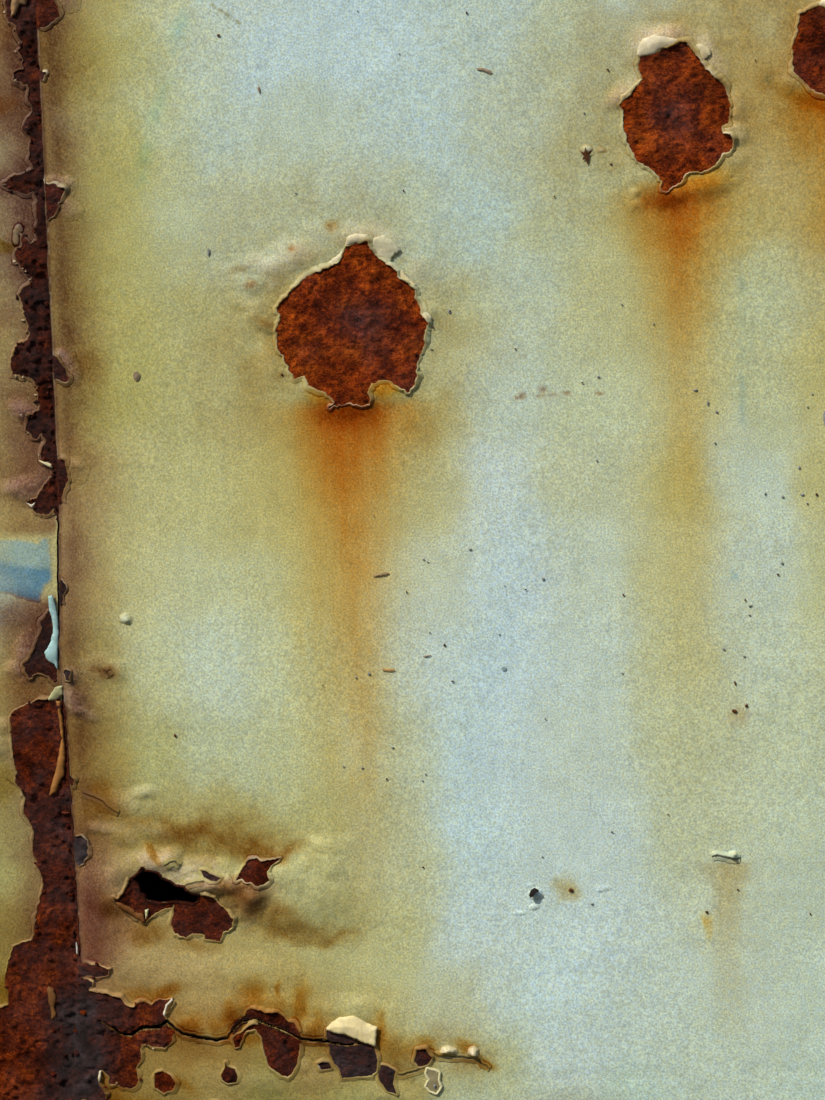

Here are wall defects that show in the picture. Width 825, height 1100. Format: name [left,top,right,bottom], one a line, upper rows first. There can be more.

peeling [787,0,825,101]
peeling [616,34,738,195]
peeling [272,233,433,413]
peeling [0,537,181,1100]
peeling [109,854,284,944]
crack [98,1016,492,1080]
peeling [219,1004,444,1098]